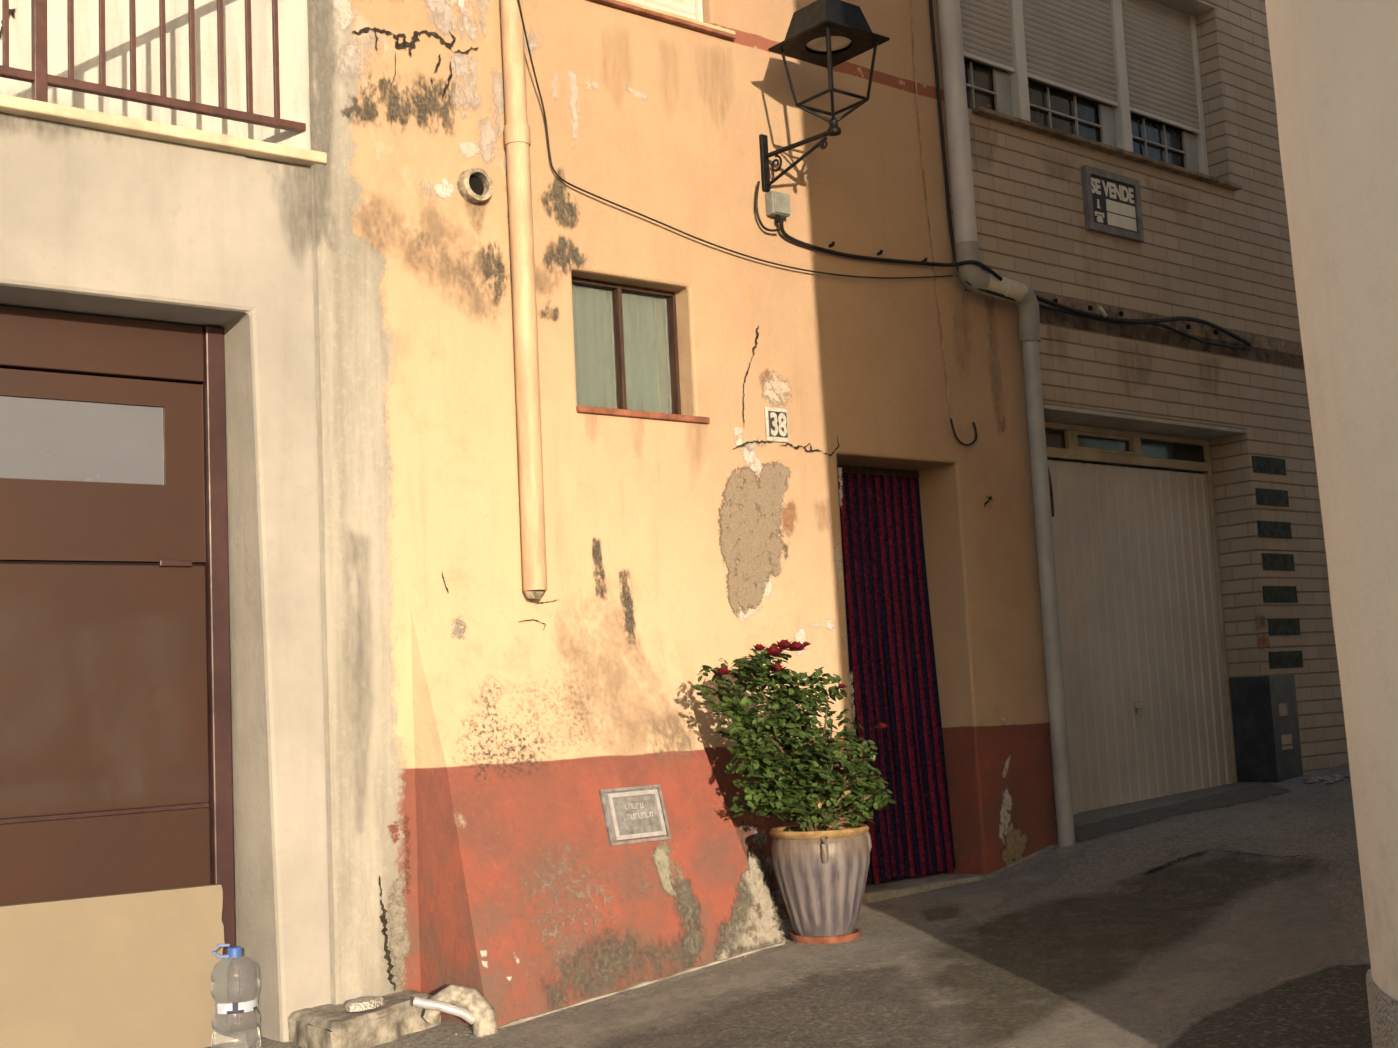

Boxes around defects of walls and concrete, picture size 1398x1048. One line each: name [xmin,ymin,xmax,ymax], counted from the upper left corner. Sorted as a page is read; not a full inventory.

water stain [290,0,455,244]
crack [352,27,479,97]
peeling [451,55,507,176]
water stain [408,244,506,312]
water stain [535,170,585,290]
peeling [760,370,791,408]
crack [732,326,839,456]
spalling [718,427,790,621]
water stain [592,538,635,643]
water stain [466,690,537,779]
spalling [999,756,1029,869]
peeling [533,821,786,1010]